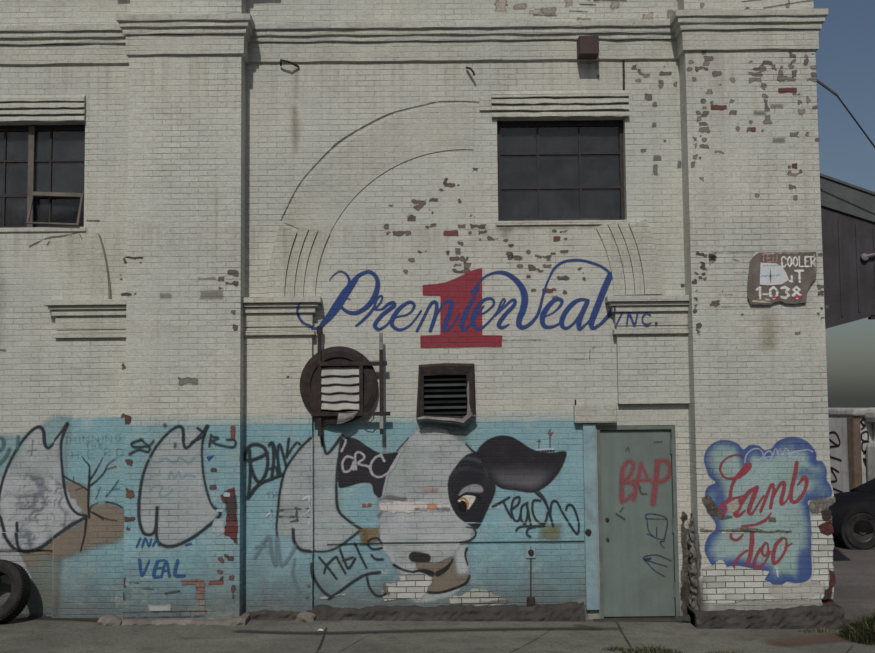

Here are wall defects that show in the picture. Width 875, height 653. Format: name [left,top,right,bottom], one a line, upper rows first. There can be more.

peeling [494,0,627,21]
peeling [631,64,677,107]
peeling [677,51,737,168]
peeling [736,51,819,132]
peeling [787,163,803,200]
peeling [384,178,568,278]
peeling [531,276,569,299]
flaking render [209,485,238,544]
flaking render [680,496,836,615]
flaking render [128,554,236,618]
flaking render [381,573,432,601]